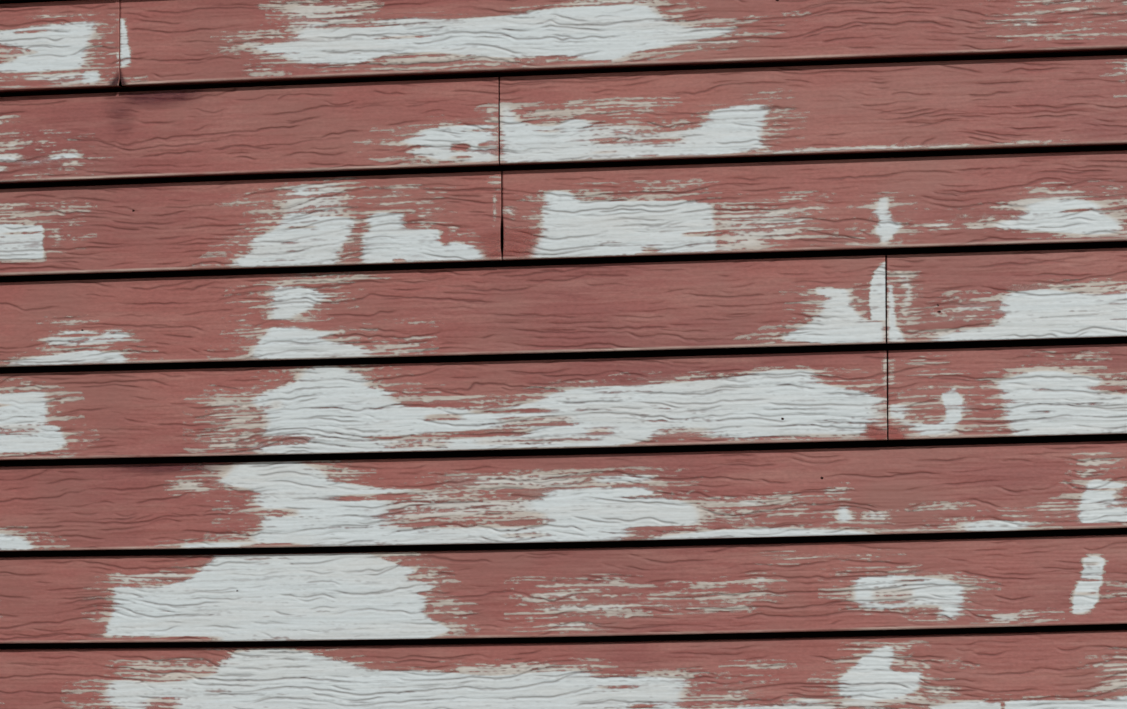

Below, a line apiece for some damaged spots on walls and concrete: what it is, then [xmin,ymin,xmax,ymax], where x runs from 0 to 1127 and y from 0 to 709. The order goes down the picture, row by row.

peeling [0,14,144,88]
peeling [220,0,780,76]
peeling [997,0,1127,41]
peeling [356,92,970,165]
peeling [0,203,95,263]
peeling [0,316,156,458]
peeling [62,176,1127,709]